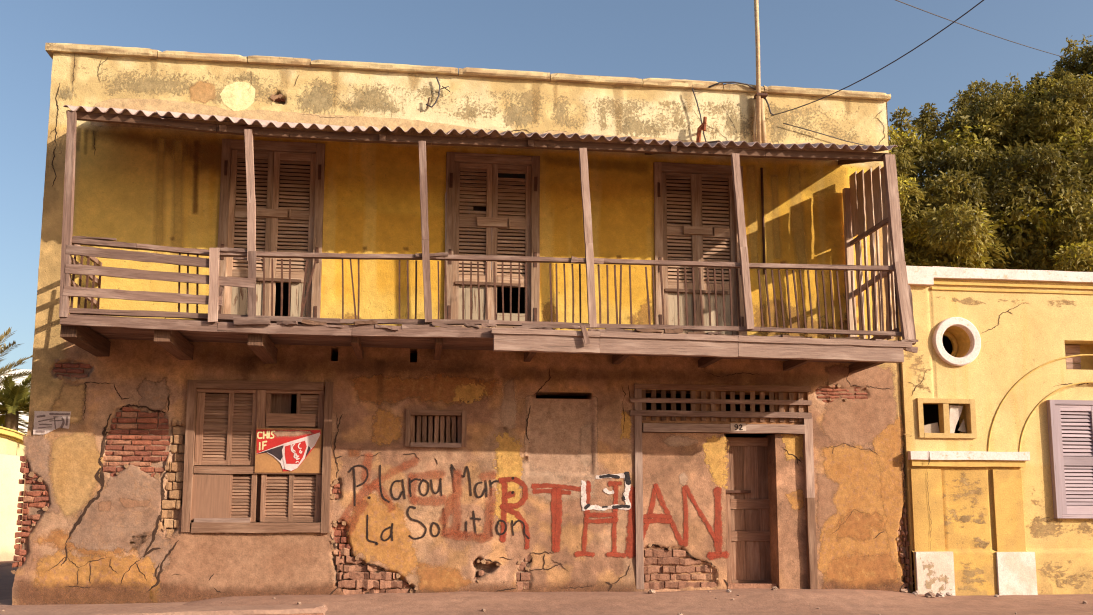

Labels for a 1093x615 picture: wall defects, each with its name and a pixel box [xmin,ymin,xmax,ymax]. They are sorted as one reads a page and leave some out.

crack [51,56,108,186]
crack [51,382,179,592]
peeling [11,359,498,603]
flaking render [644,543,719,590]
peeling [816,364,985,592]
peeling [1038,561,1093,589]